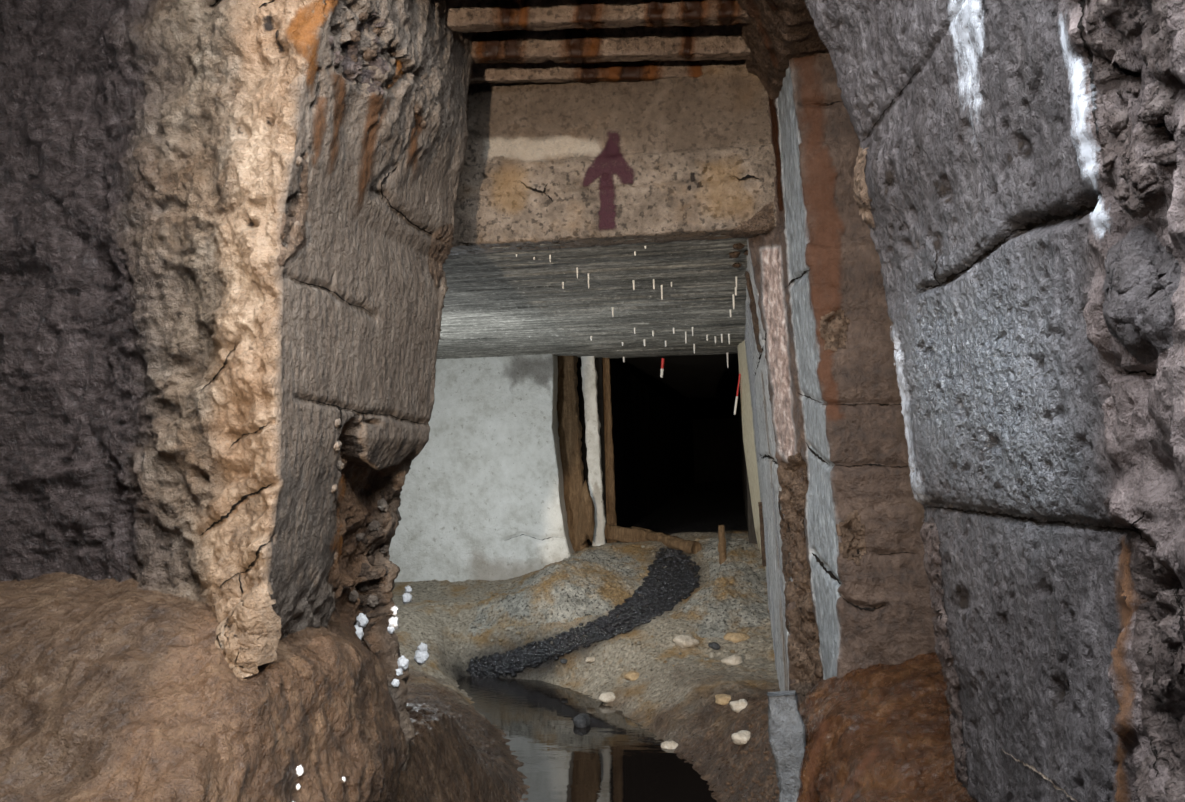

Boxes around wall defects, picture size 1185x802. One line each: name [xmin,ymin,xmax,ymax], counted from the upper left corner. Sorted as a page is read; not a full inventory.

rust [287,0,337,83]
rust [476,0,528,64]
rust [563,0,661,83]
rust [647,0,665,28]
rust [680,0,739,78]
crack [918,205,1095,292]
crack [199,483,273,536]
crack [923,506,1156,548]
crack [219,540,271,594]